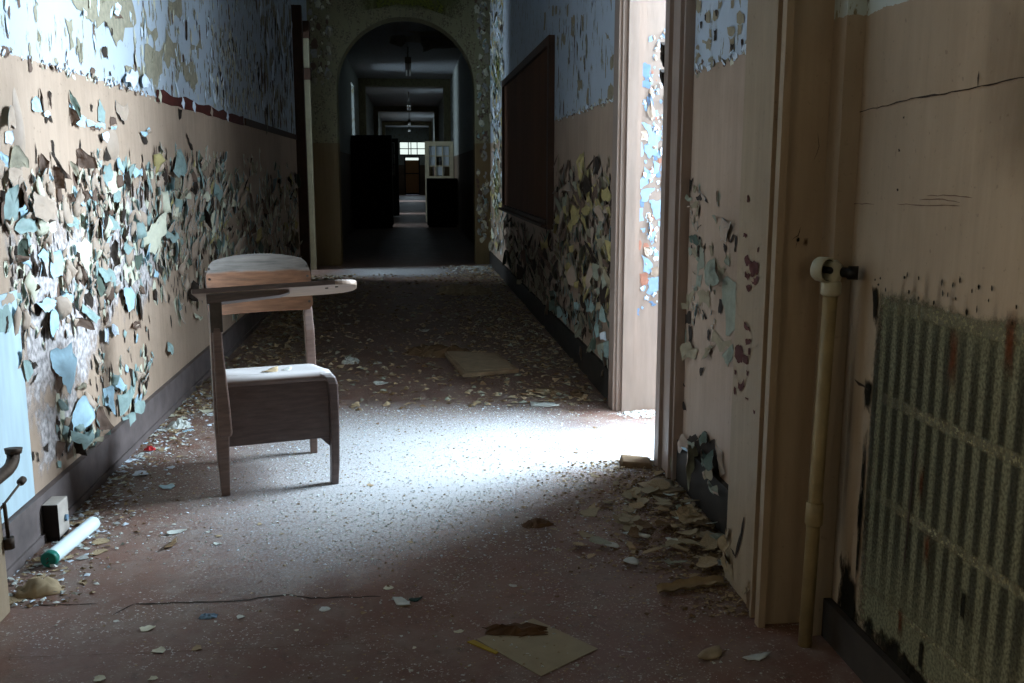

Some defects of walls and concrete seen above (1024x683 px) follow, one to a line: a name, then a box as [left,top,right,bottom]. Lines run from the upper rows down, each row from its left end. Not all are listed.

peeling [0,0,303,470]
peeling [474,0,614,376]
peeling [637,29,665,316]
peeling [680,178,737,376]
peeling [693,0,746,78]
crack [860,73,1024,112]
peeling [670,431,725,496]